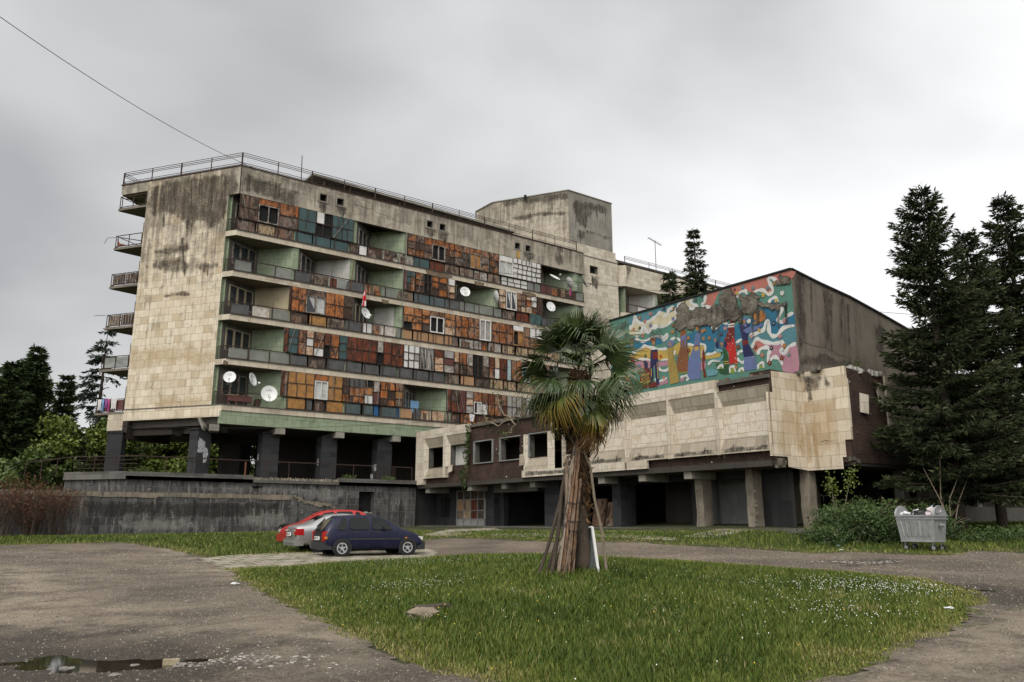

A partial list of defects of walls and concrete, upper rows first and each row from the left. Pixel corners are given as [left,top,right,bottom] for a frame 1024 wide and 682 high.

damp [149,174,295,274]
damp [505,193,606,244]
flaking render [673,287,788,339]